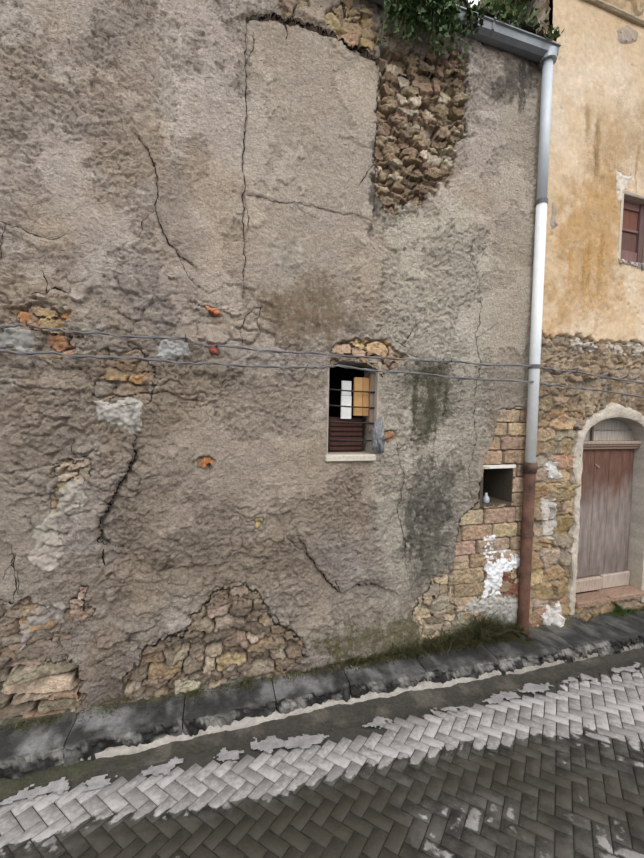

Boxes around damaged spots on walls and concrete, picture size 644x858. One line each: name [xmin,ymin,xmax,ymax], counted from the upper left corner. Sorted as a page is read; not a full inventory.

crack [135,132,193,281]
crack [240,12,380,343]
spalling [325,0,470,216]
spalling [11,303,84,363]
crack [97,433,137,565]
crack [290,540,381,591]
leakage [400,361,464,587]
spalling [412,407,527,643]
spalling [0,586,94,720]
spalling [123,583,306,698]